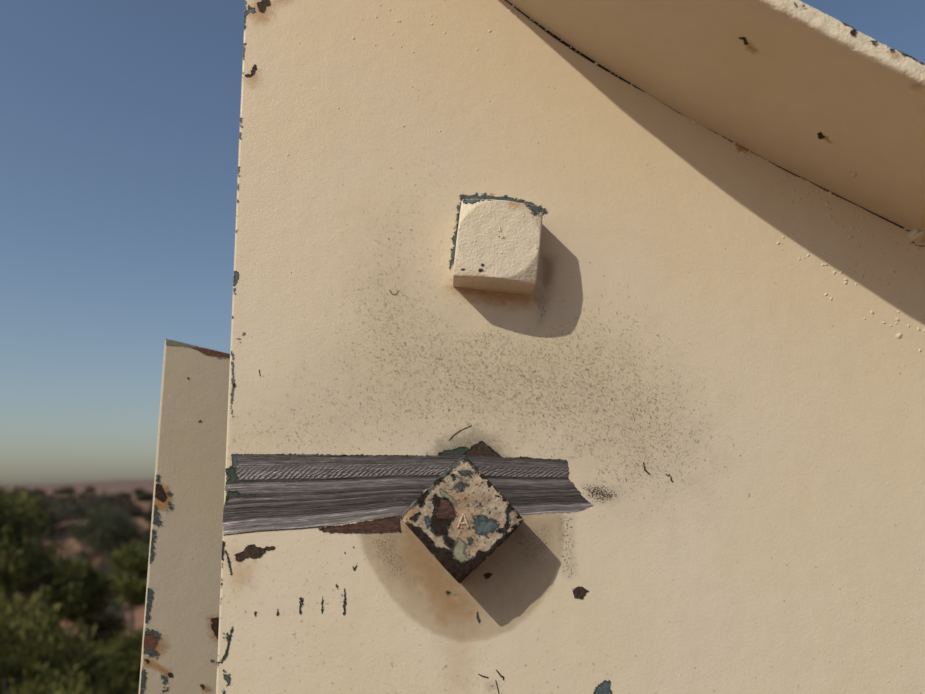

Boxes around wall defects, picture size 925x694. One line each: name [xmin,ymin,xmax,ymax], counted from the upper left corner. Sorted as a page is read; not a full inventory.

peeling [244,0,271,30]
peeling [449,192,547,270]
rust [153,475,174,527]
rust [319,473,522,582]
peeling [221,541,275,564]
peeling [573,586,589,600]
rust [211,617,219,639]
rust [143,628,173,685]
peeling [593,680,612,694]